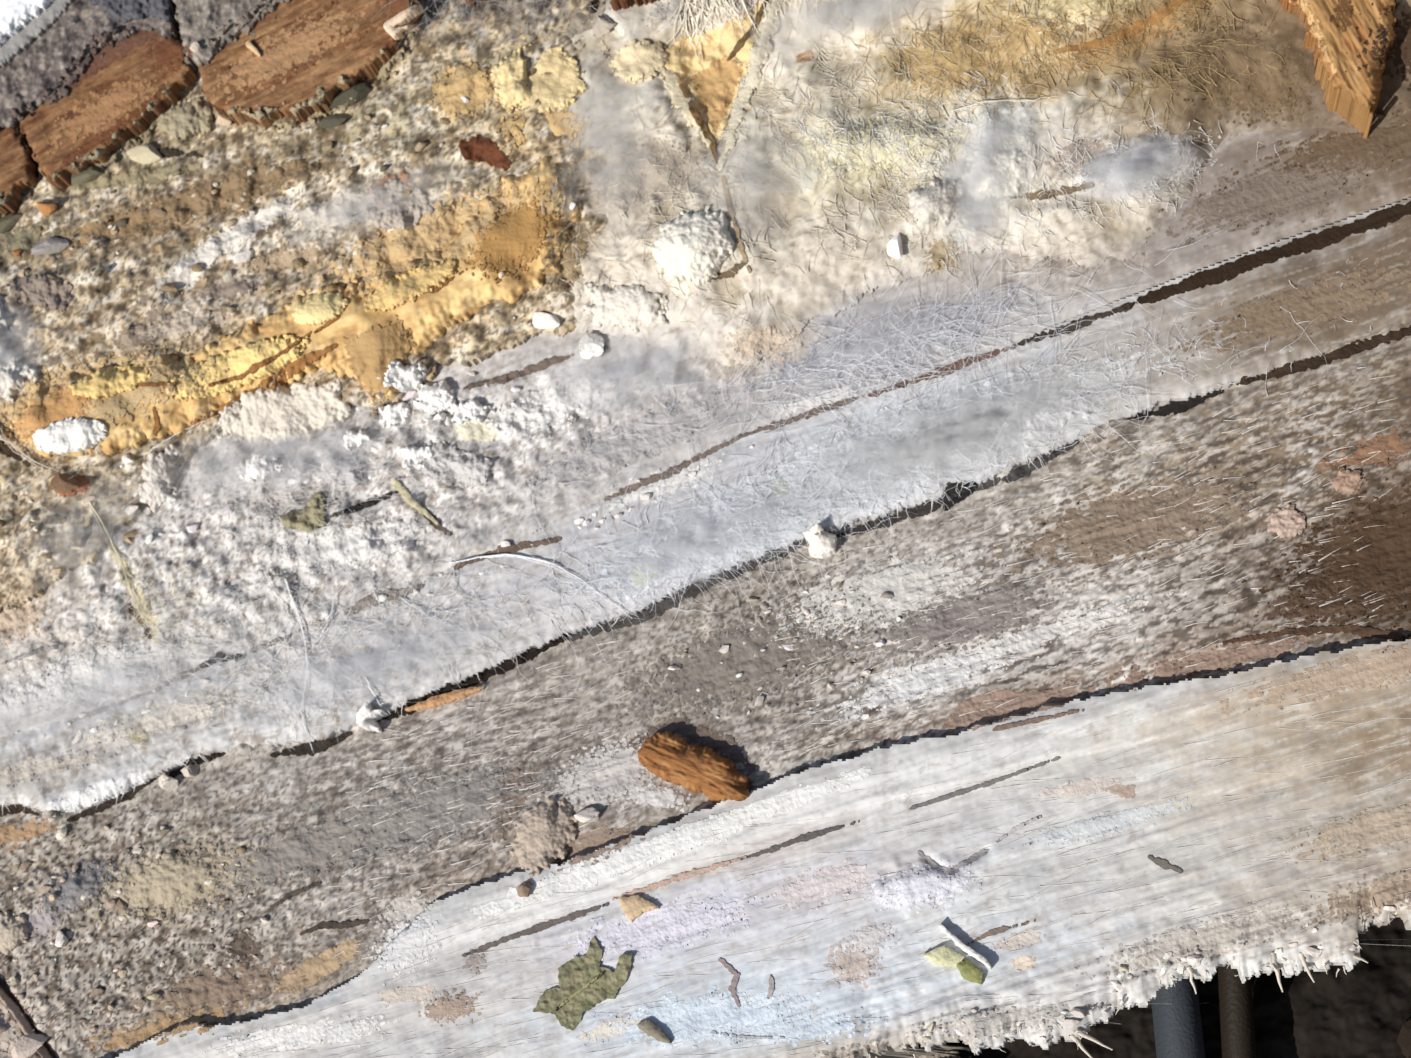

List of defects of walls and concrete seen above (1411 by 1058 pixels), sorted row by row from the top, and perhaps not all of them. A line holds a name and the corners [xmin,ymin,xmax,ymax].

spalling [89,0,174,24]
leakage [869,0,1411,266]
spalling [364,179,433,231]
crack [1010,181,1095,201]
crack [463,345,611,391]
crack [604,200,1411,501]
leakage [0,99,1411,940]
crack [270,439,1084,758]
crack [1222,625,1411,645]
crack [68,635,291,723]
crack [0,752,226,822]
crack [909,756,1060,810]